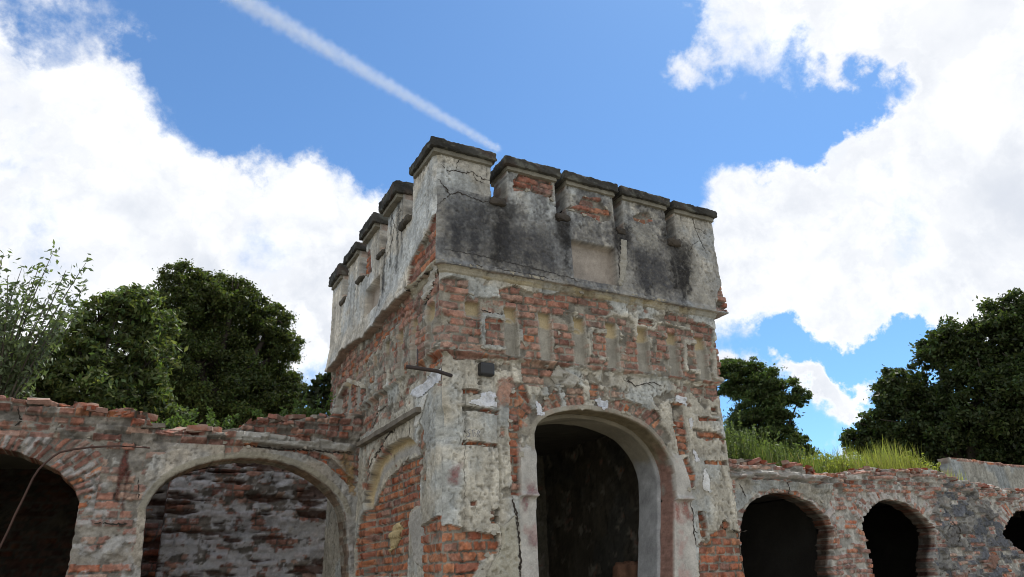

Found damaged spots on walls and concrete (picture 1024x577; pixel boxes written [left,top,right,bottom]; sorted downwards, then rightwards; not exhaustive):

crack [436,160,490,206]
water stain [449,205,570,271]
spalling [512,174,612,224]
water stain [614,226,693,298]
spalling [404,213,613,427]
spalling [57,406,152,443]
spalling [223,306,406,487]
spalling [458,309,728,496]
spalling [354,454,501,577]
crack [500,499,522,577]
spalling [812,483,875,577]